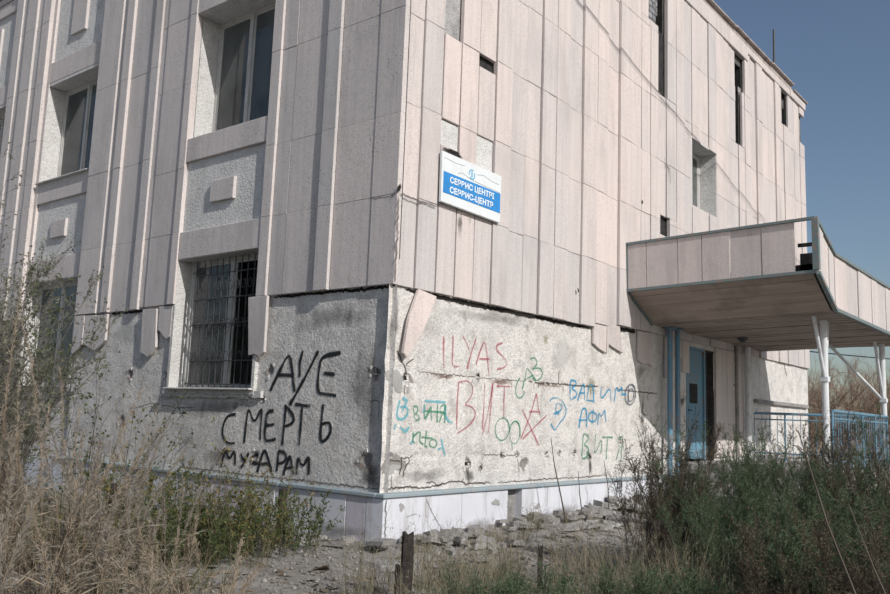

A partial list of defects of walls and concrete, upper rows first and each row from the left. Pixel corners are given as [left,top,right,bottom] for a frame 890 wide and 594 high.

peeling [440,120,458,151]
peeling [476,135,493,172]
crack [372,193,437,281]
crack [397,350,597,394]
spalling [381,452,406,474]